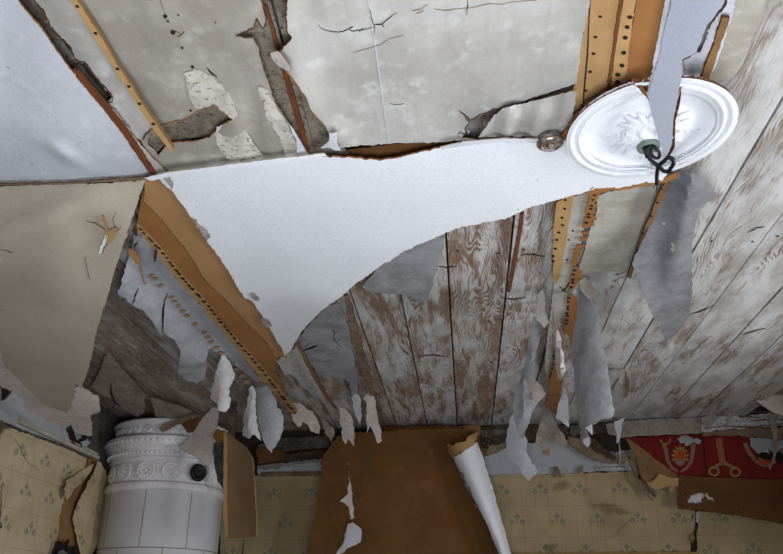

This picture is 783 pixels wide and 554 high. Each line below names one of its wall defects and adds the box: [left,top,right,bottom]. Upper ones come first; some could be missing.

peeling [184,69,238,119]
crack [319,0,535,143]
peeling [214,128,263,163]
peeling [258,86,297,157]
peeling [678,435,701,446]
peeling [749,437,783,464]